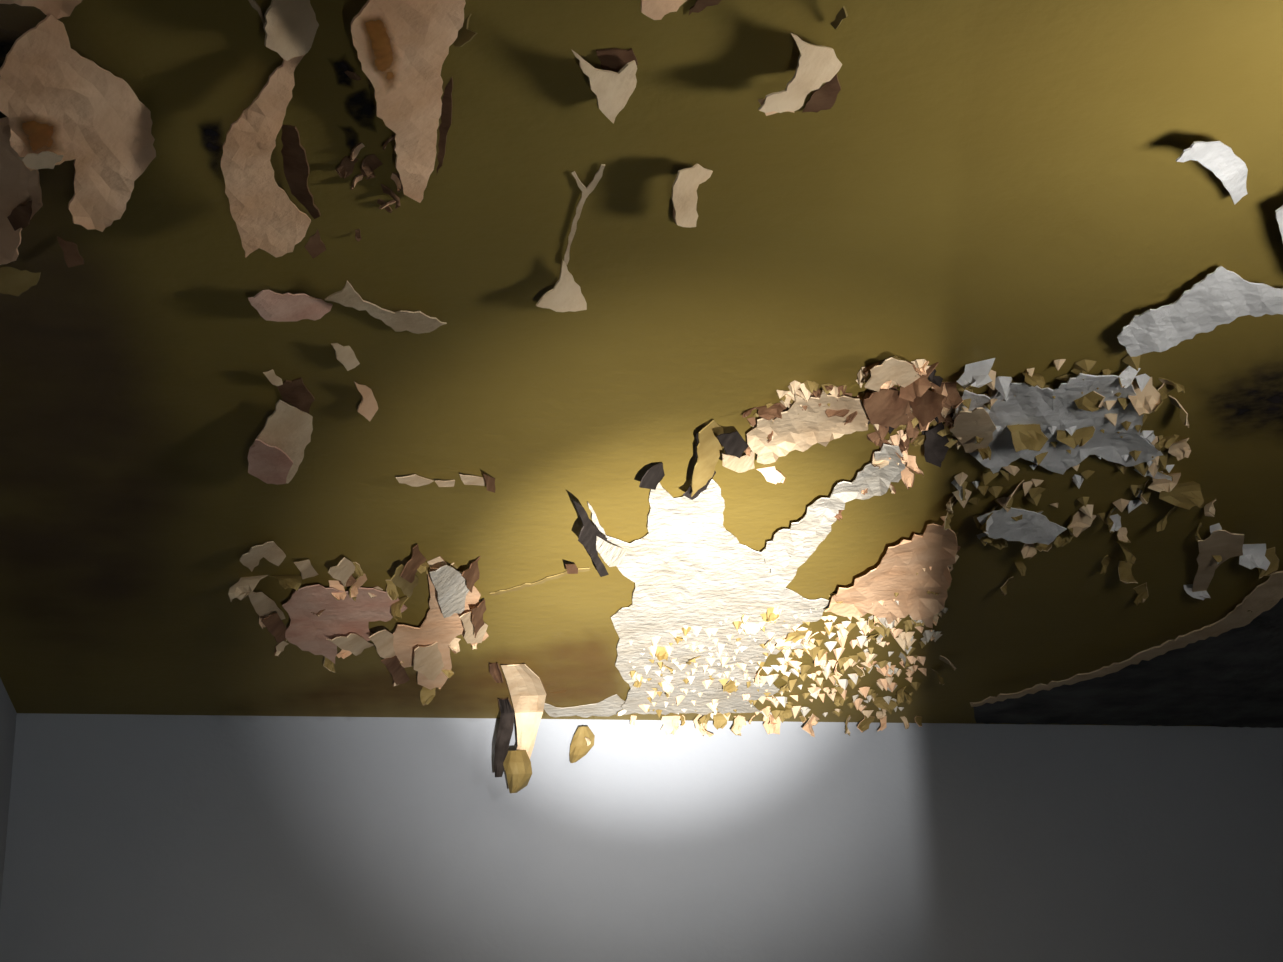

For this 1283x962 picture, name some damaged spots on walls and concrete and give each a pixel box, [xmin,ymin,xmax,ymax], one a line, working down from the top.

peeling [0,0,156,296]
peeling [221,0,326,258]
peeling [336,0,477,213]
crack [564,164,605,265]
peeling [571,48,638,124]
peeling [671,163,713,228]
peeling [758,33,842,116]
flaking render [1275,205,1283,242]
peeling [248,281,447,334]
peeling [247,369,315,485]
flaking render [489,259,1283,793]
peeling [228,541,489,706]